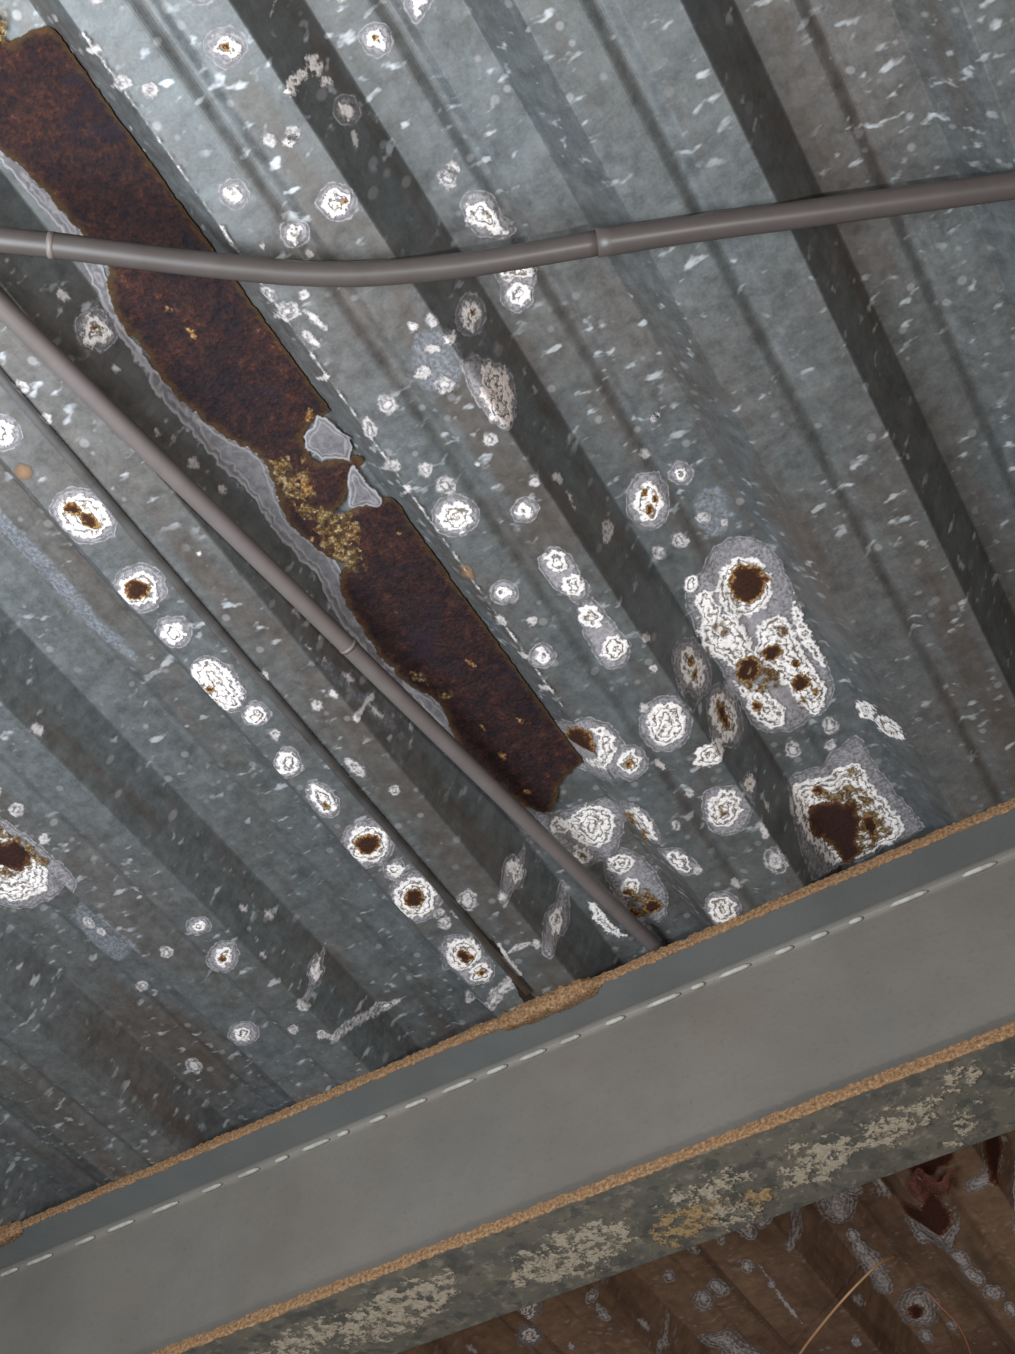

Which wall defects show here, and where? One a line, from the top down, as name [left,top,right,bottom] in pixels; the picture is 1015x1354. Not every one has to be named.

rust [203,25,248,70]
rust [0,10,215,252]
rust [263,126,300,148]
rust [283,52,361,148]
rust [218,178,250,208]
rust [280,219,314,258]
rust [315,182,358,222]
rust [436,160,516,239]
rust [0,263,1015,1247]
rust [150,1022,1015,1354]